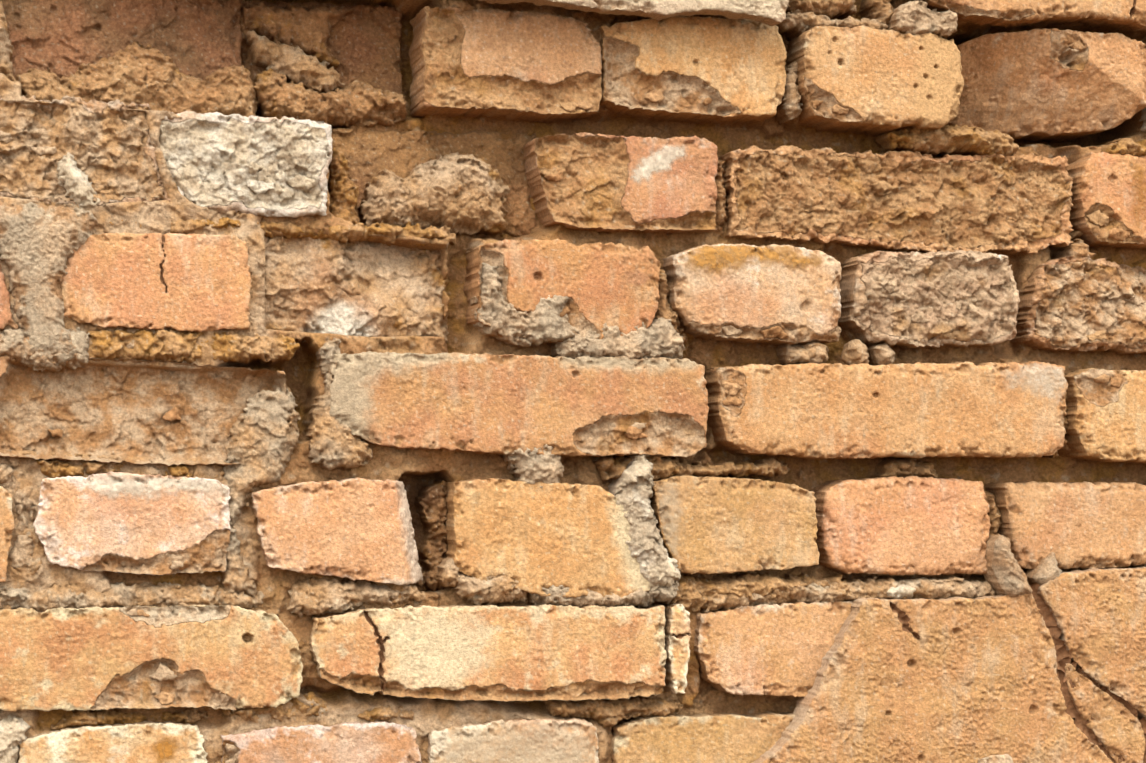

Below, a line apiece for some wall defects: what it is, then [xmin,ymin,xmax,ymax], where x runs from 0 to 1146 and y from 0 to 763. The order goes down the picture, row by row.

crack [1129,0,1137,18]
spalling [0,100,329,210]
spalling [534,134,717,231]
spalling [733,151,1070,343]
spalling [1034,259,1146,349]
spalling [0,358,287,466]
spalling [573,411,706,457]
spalling [83,529,231,575]
spalling [90,659,237,710]
spalling [319,668,664,702]
flaking render [752,534,1146,763]
crack [1030,584,1146,763]